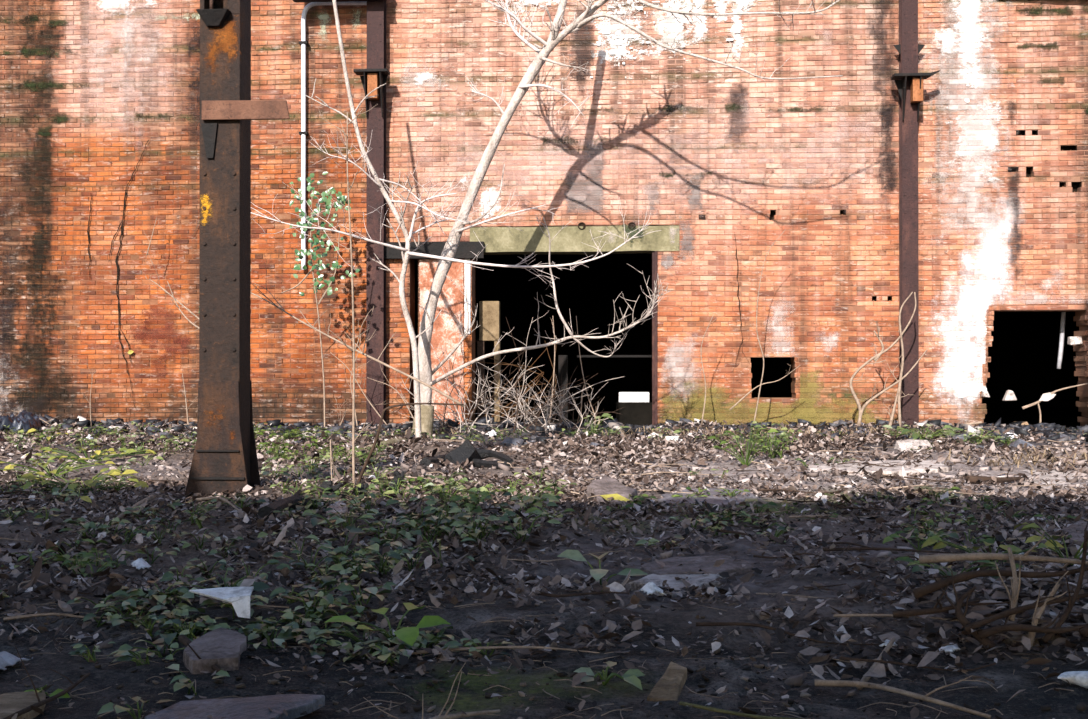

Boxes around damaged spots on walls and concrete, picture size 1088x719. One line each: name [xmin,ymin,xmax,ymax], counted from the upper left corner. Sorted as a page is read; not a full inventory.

corrosion [205,15,238,72]
peeling [591,0,754,81]
leakage [0,0,70,417]
corrosion [201,195,210,223]
leakage [932,0,1022,394]
crack [87,140,149,408]
leakage [667,344,694,392]